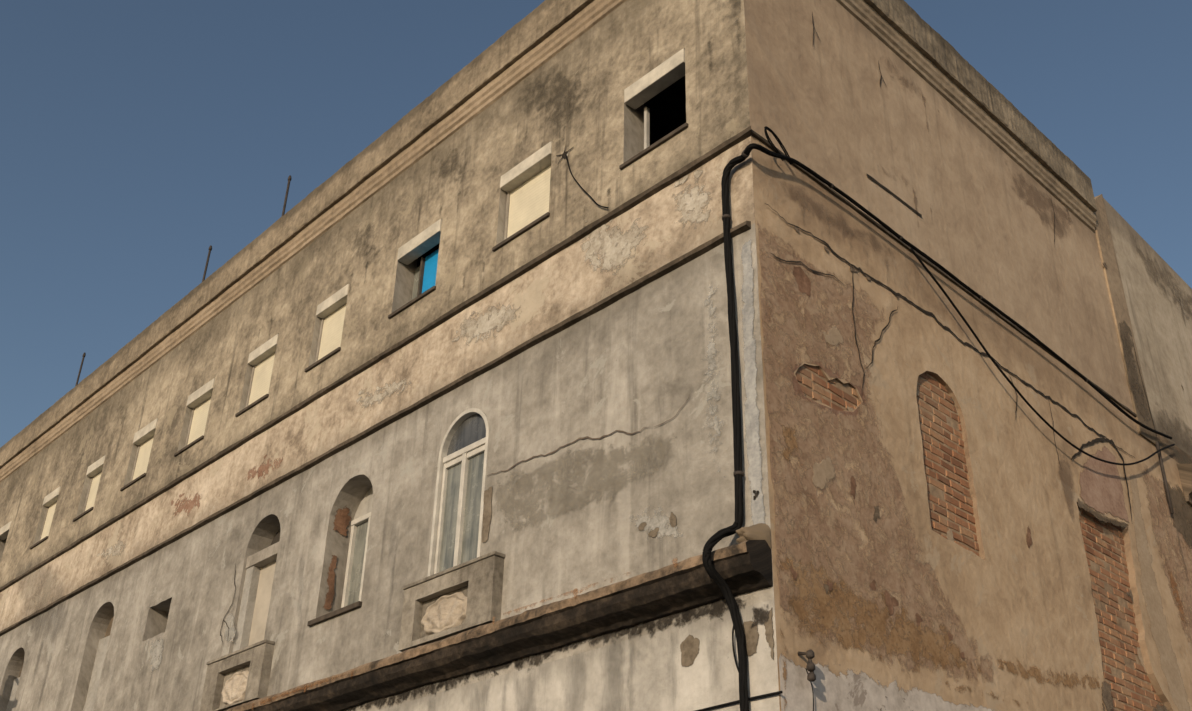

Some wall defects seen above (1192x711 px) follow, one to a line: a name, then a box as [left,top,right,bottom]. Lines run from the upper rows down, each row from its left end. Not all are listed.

crack [766,204,1160,521]
crack [220,565,236,644]
flaking render [323,555,337,610]
flaking render [333,506,352,536]
flaking render [482,394,690,543]
peeling [680,634,700,667]
flaking render [743,223,994,711]
flaking render [1143,468,1192,643]